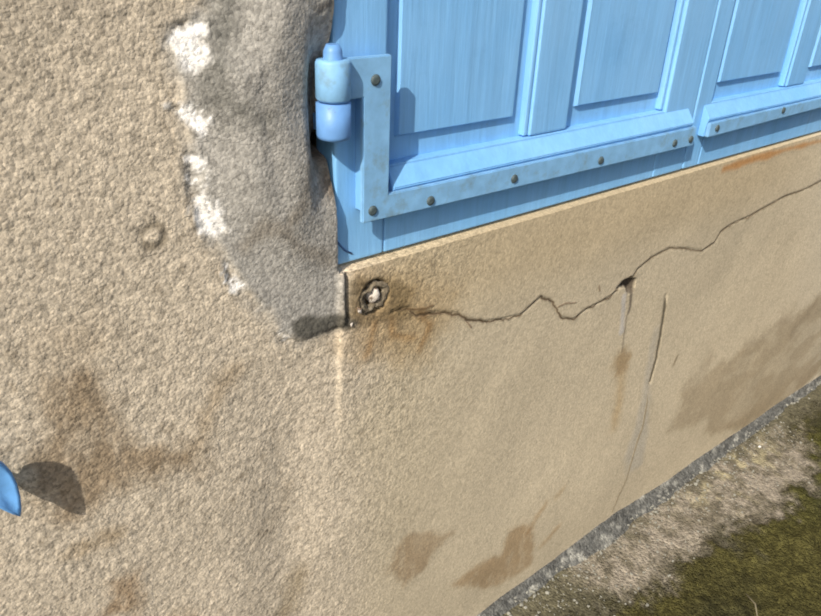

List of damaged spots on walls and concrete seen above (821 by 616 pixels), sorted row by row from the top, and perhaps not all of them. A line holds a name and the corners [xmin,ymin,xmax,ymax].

corrosion [719,137,821,176]
corrosion [318,251,476,393]
crack [392,180,821,328]
flaking render [615,273,638,295]
leakage [606,286,661,480]
crack [611,297,667,513]
leakage [664,288,821,440]
leakage [382,526,458,592]
leakage [449,478,570,594]